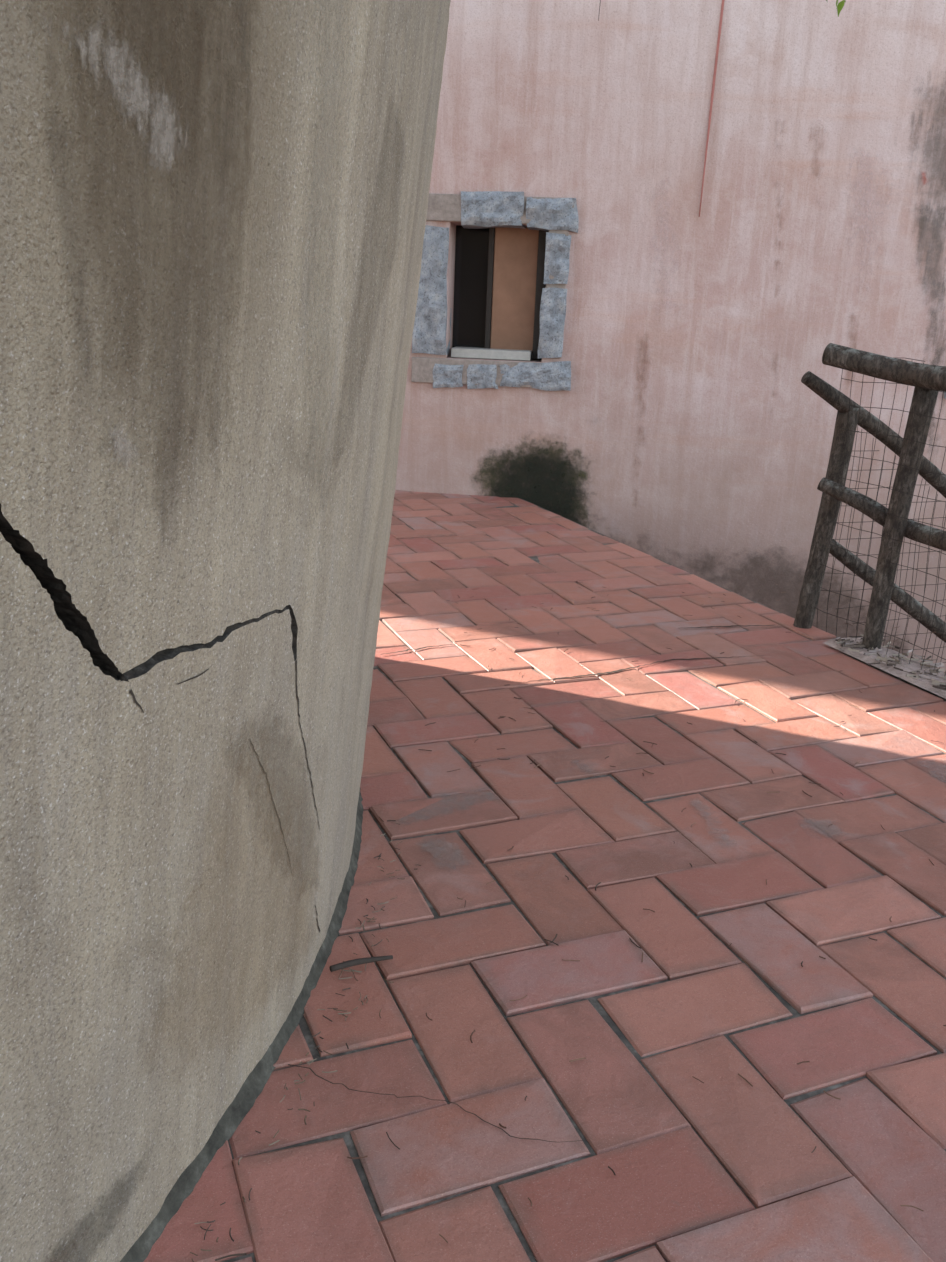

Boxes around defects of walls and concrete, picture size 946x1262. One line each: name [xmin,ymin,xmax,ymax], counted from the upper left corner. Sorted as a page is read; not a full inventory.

damp [474,441,588,526]
crack [0,503,320,831]
crack [250,740,292,874]